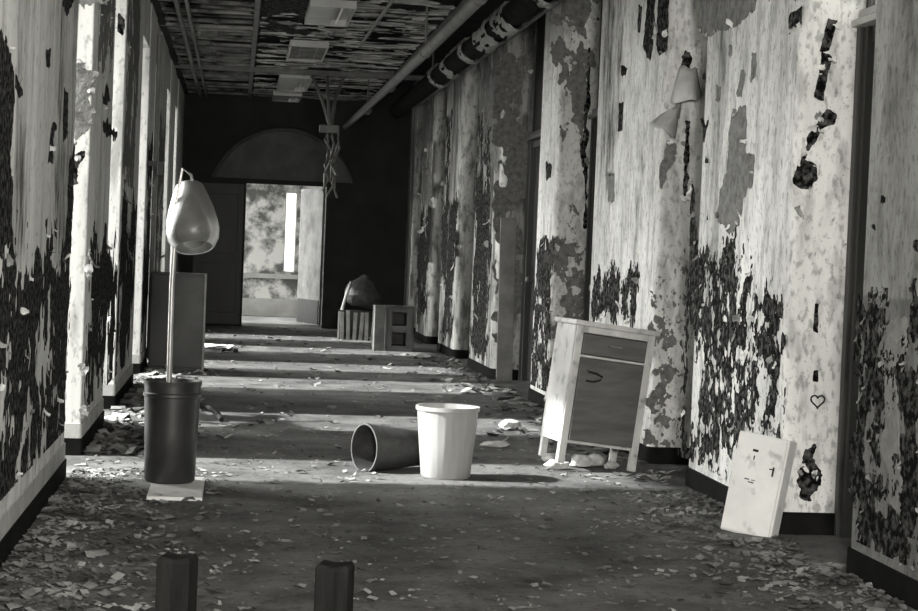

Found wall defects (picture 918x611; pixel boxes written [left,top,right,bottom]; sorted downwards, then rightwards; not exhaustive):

peeling [0,0,166,501]
peeling [416,97,459,342]
peeling [468,46,533,361]
peeling [549,0,601,170]
peeling [530,205,640,401]
peeling [643,0,669,60]
peeling [643,50,786,480]
peeling [699,0,757,37]
peeling [787,0,802,39]
peeling [791,18,843,218]
peeling [796,444,822,502]
peeling [848,278,918,571]